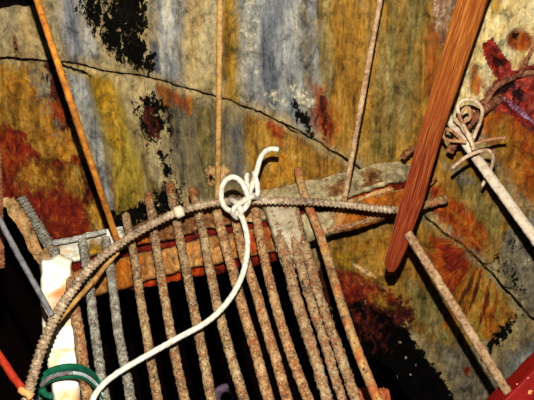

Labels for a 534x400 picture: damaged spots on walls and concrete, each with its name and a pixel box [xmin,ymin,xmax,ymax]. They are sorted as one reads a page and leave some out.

corrosion [0,61,158,240]
leakage [60,0,183,81]
crack [0,56,361,169]
leakage [131,87,248,215]
spalling [0,149,399,400]
leakage [236,0,322,139]
corrosion [312,0,457,167]
corrosion [313,181,472,349]
spalling [421,195,448,210]
corrosion [412,143,515,341]
crack [424,214,534,321]
corrosion [481,109,534,205]